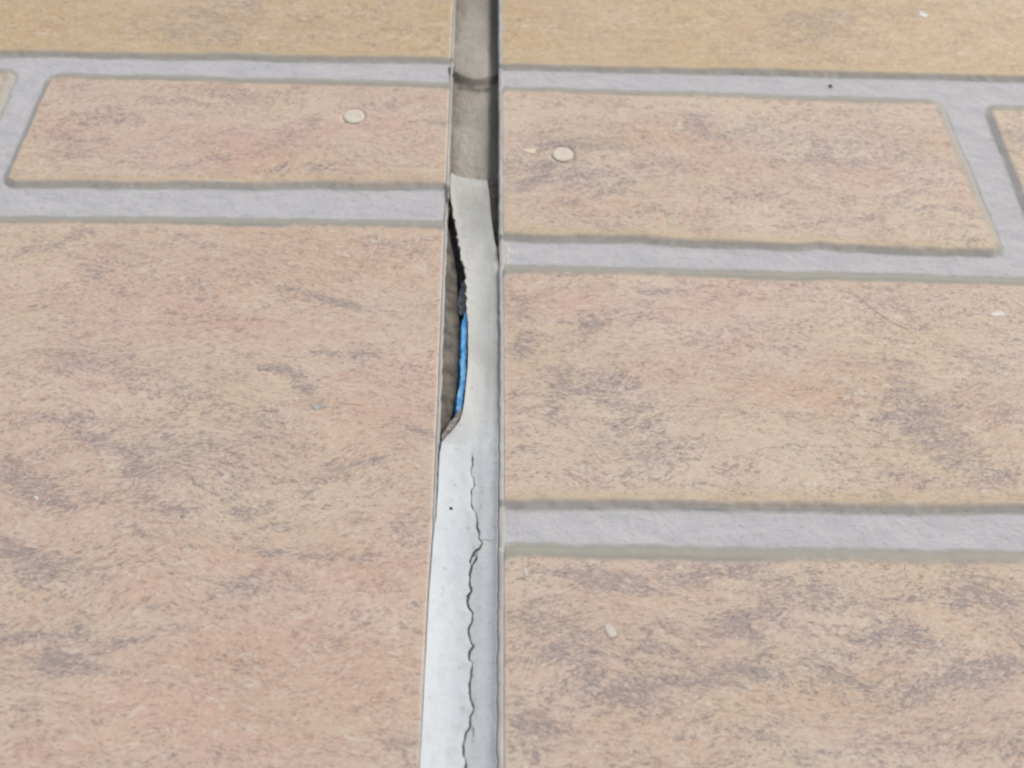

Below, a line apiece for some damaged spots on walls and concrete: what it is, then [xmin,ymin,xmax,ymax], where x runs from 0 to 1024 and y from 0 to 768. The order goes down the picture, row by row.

crack [462,452,492,768]